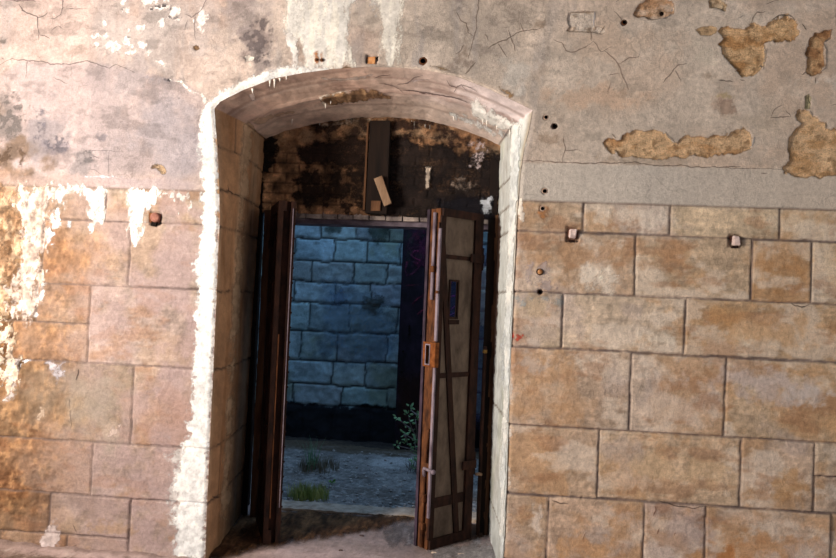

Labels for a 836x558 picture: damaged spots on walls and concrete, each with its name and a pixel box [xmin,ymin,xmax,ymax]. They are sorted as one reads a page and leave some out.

crack [14,0,85,40]
crack [0,57,135,84]
damp [90,21,151,57]
crack [376,0,639,103]
spalling [634,0,674,20]
spalling [696,14,832,83]
spalling [319,89,390,106]
damp [0,147,25,165]
spalling [604,128,755,160]
spalling [783,94,836,179]
damp [0,180,107,401]
damp [126,0,356,558]